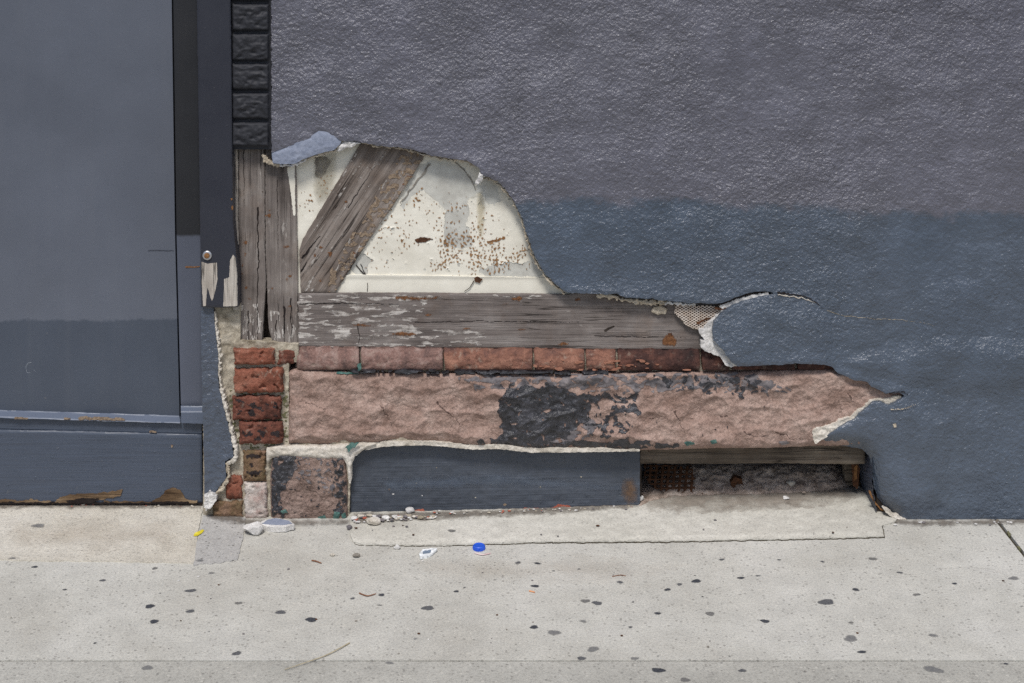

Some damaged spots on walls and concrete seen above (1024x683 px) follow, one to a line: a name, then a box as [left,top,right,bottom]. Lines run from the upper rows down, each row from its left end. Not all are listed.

corrosion [354,187,535,283]
peeling [0,131,565,522]
crack [717,291,933,326]
peeling [336,292,791,449]
spalling [812,394,901,444]
peeling [481,503,632,513]
spalling [882,505,906,520]